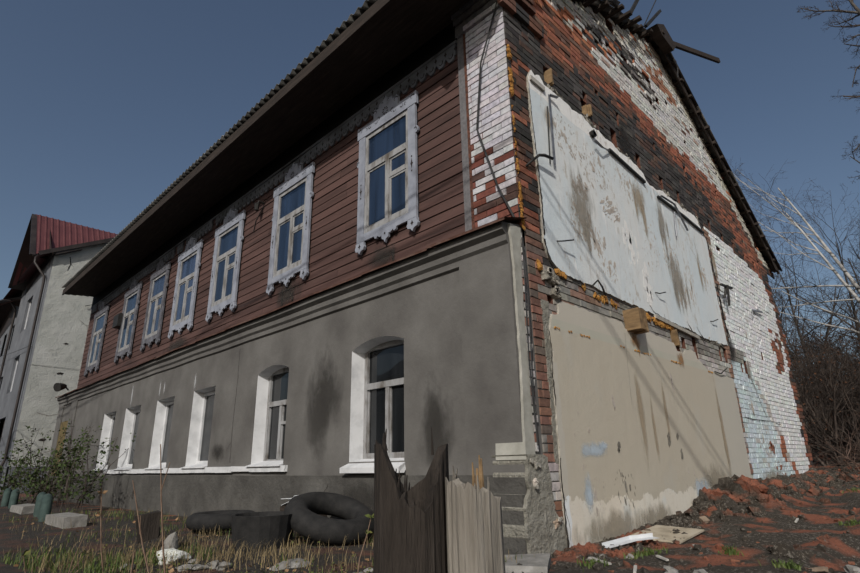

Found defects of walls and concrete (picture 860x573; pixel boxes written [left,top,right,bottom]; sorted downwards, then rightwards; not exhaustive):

damp [572,182,593,249]
damp [634,189,647,233]
damp [658,211,690,307]
damp [310,372,336,435]
damp [425,397,447,458]
spalling [530,457,541,489]